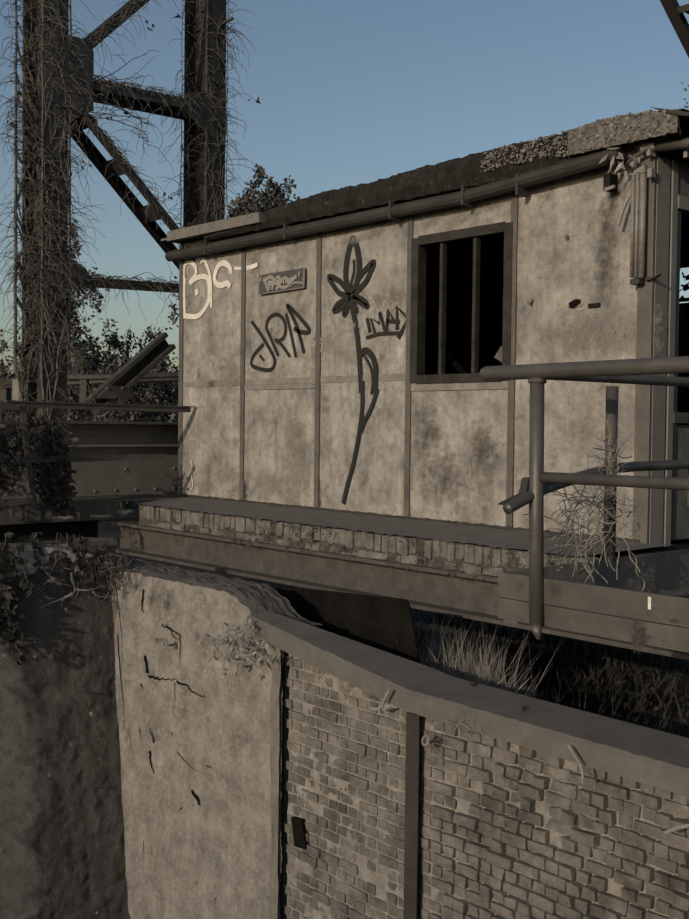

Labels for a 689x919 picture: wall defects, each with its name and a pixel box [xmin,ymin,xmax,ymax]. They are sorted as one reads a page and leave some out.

leakage [0,633,45,919]